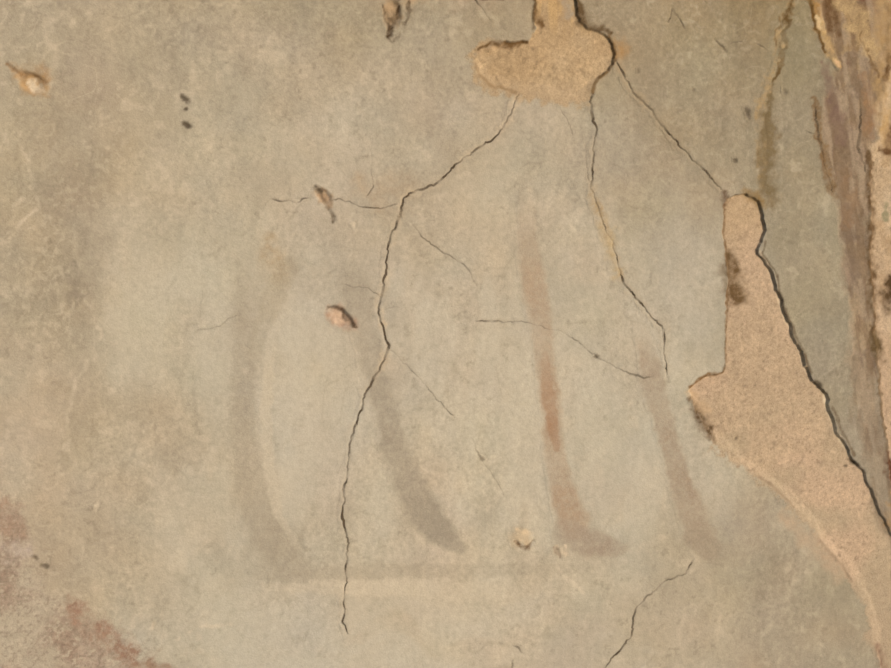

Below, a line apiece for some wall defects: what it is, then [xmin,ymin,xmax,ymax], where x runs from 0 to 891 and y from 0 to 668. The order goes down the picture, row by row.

peeling [380,0,414,44]
peeling [3,61,52,100]
flaking render [464,0,641,111]
peeling [311,184,338,225]
crack [585,53,723,385]
peeling [323,301,363,337]
flaking render [683,0,891,668]
crack [337,86,524,642]
crack [607,612,636,665]